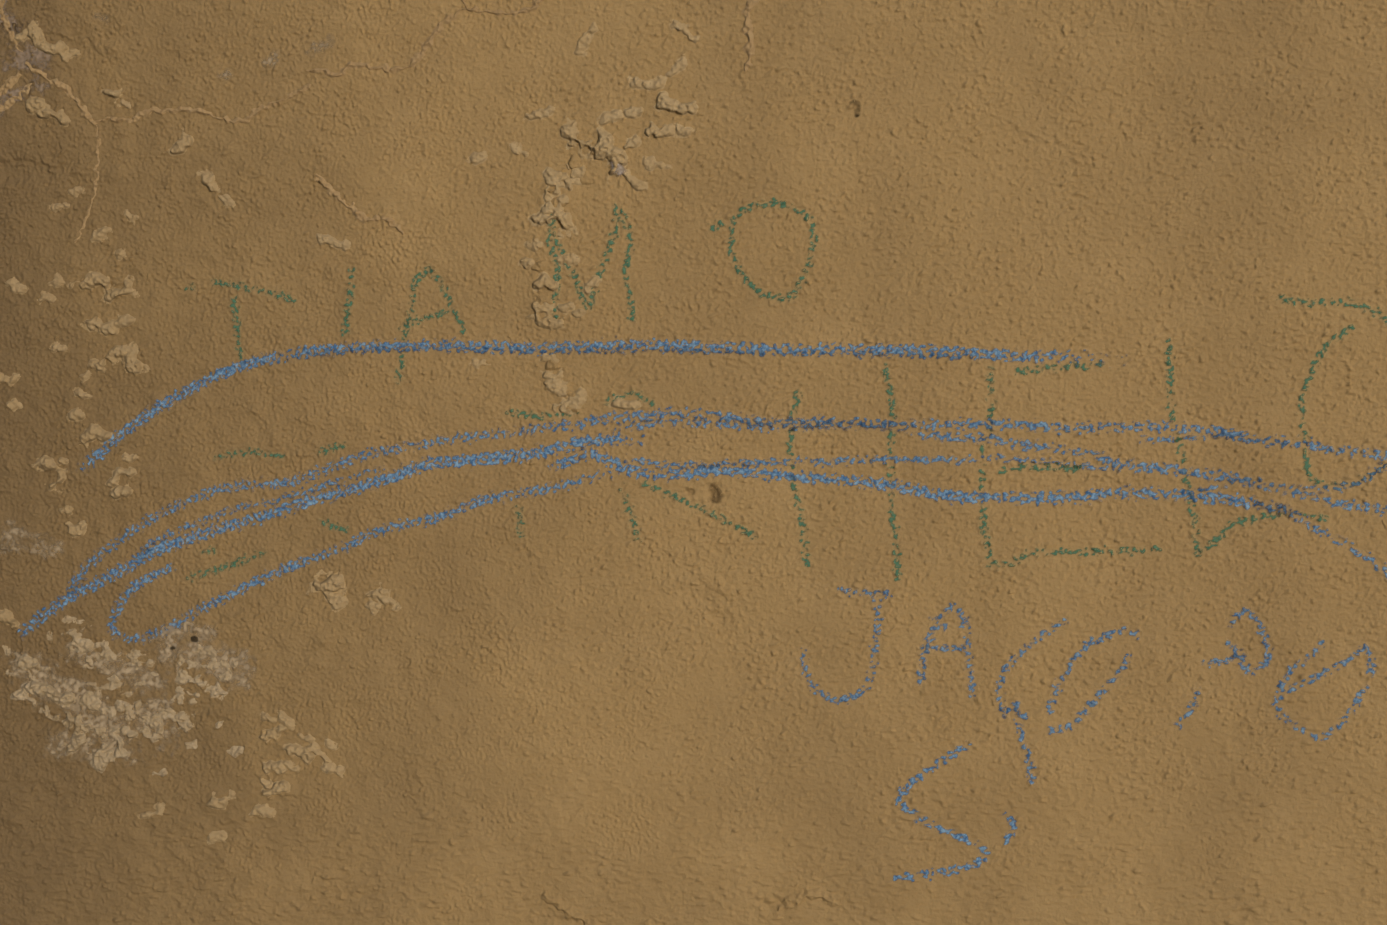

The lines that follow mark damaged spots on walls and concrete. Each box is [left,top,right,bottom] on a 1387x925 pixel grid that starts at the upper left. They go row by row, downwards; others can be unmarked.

peeling [0,609,20,630]
spalling [2,615,256,773]